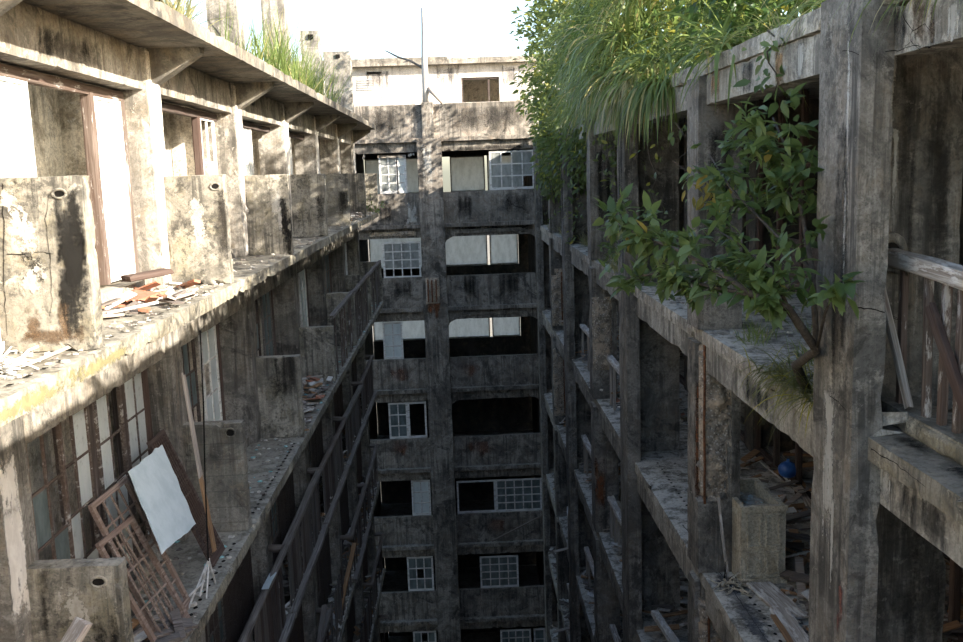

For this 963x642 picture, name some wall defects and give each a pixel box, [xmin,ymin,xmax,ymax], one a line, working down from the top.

crack [1,184,53,330]
damp [21,248,42,281]
damp [25,191,88,345]
damp [272,193,292,254]
peeling [0,455,31,616]